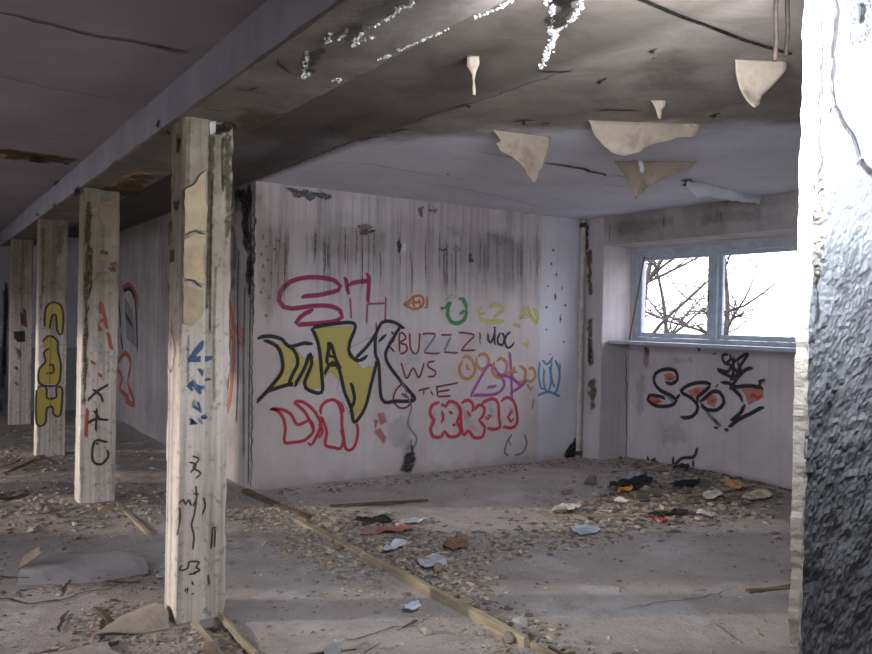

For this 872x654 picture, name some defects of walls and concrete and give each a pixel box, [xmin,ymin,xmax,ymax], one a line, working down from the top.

crack [0,12,189,54]
spalling [306,48,325,73]
spalling [345,24,362,42]
spalling [538,0,585,69]
crack [638,0,792,55]
peeling [735,59,787,108]
crack [818,0,872,194]
peeling [492,130,551,184]
peeling [588,100,761,204]
crack [814,267,822,321]
crack [622,351,630,457]
crack [624,587,736,609]